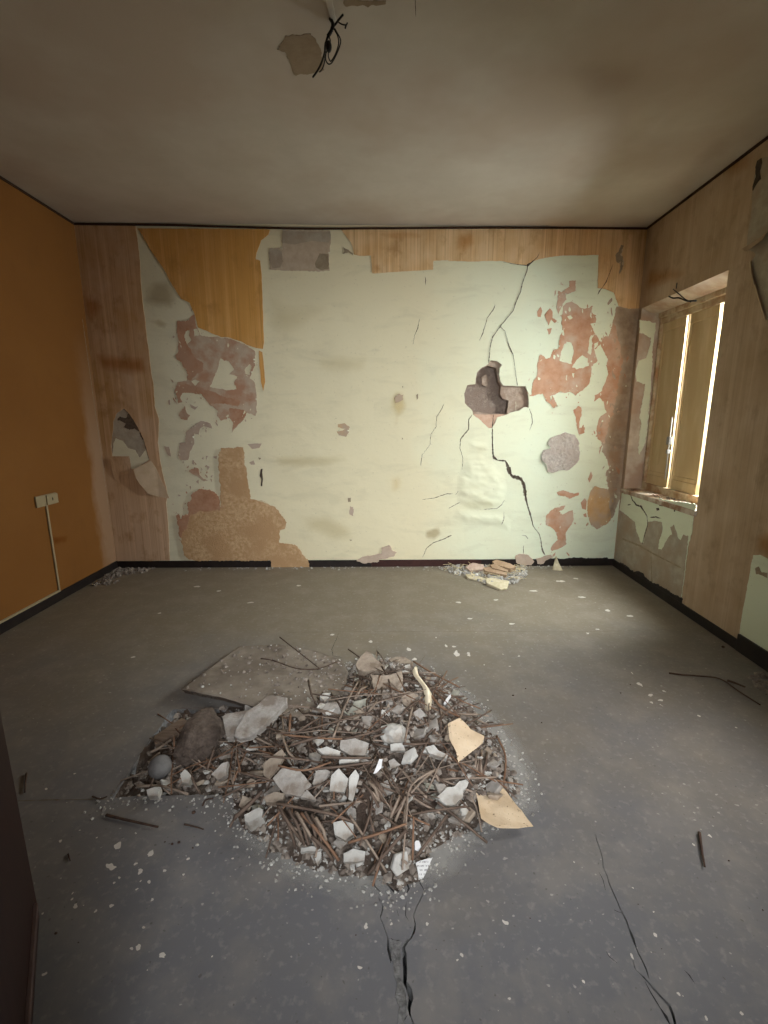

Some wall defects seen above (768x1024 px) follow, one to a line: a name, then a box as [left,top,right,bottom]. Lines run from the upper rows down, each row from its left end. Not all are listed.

flaking render [277,33,324,76]
flaking render [269,229,353,272]
crack [479,256,538,385]
flaking render [111,409,146,464]
flaking render [164,308,309,567]
crack [460,415,545,555]
peeling [464,280,696,597]
crack [374,875,427,1024]
crack [595,835,676,1024]